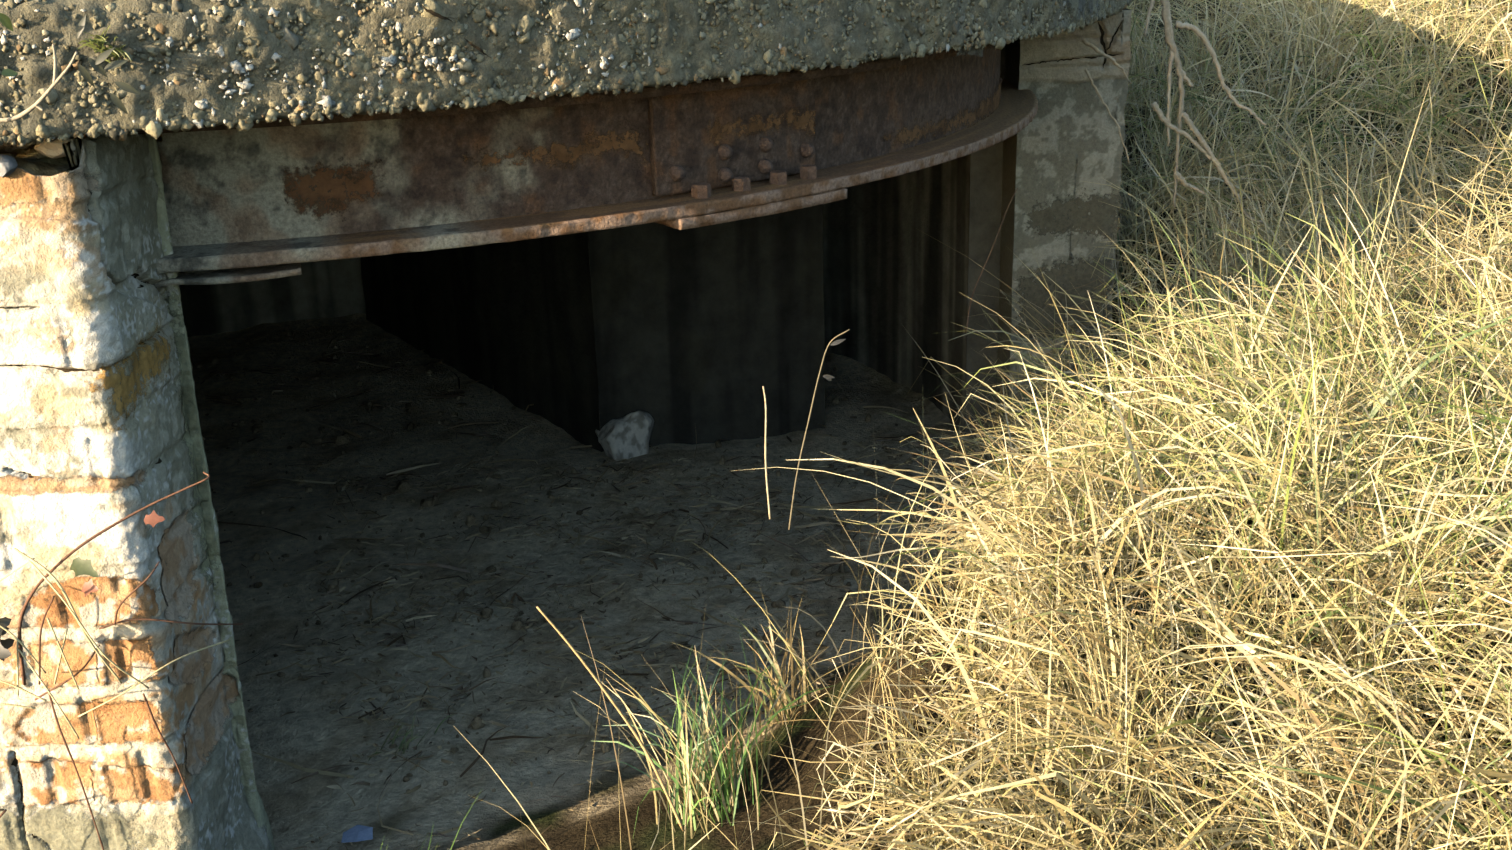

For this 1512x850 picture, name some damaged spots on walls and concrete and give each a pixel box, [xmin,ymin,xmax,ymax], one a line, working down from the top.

corrosion [463,128,649,172]
corrosion [283,158,385,219]
corrosion [154,263,302,288]
spalling [8,505,239,806]